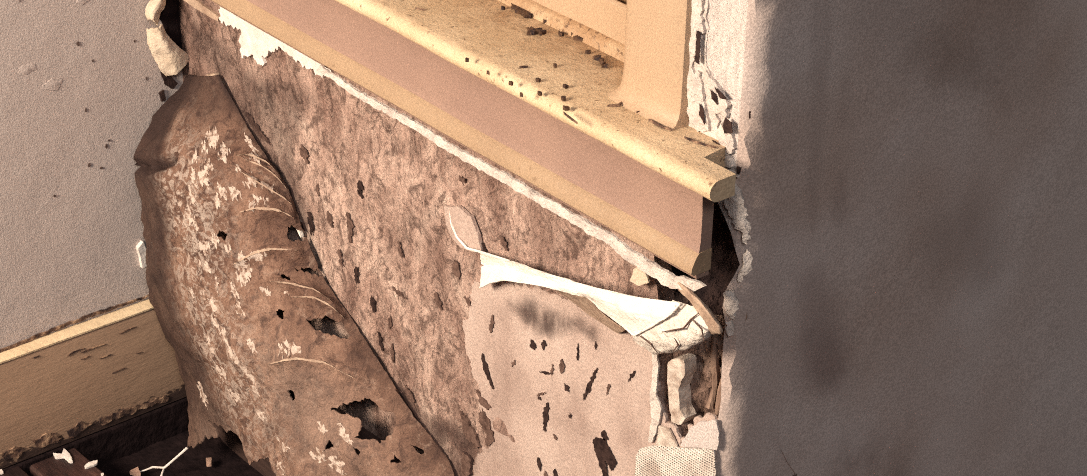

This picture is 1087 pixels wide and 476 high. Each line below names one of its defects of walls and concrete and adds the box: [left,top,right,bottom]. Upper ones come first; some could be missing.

flaking render [133,0,189,102]
flaking render [136,240,147,268]
flaking render [301,212,314,237]
flaking render [316,0,753,476]
spalling [0,395,169,469]